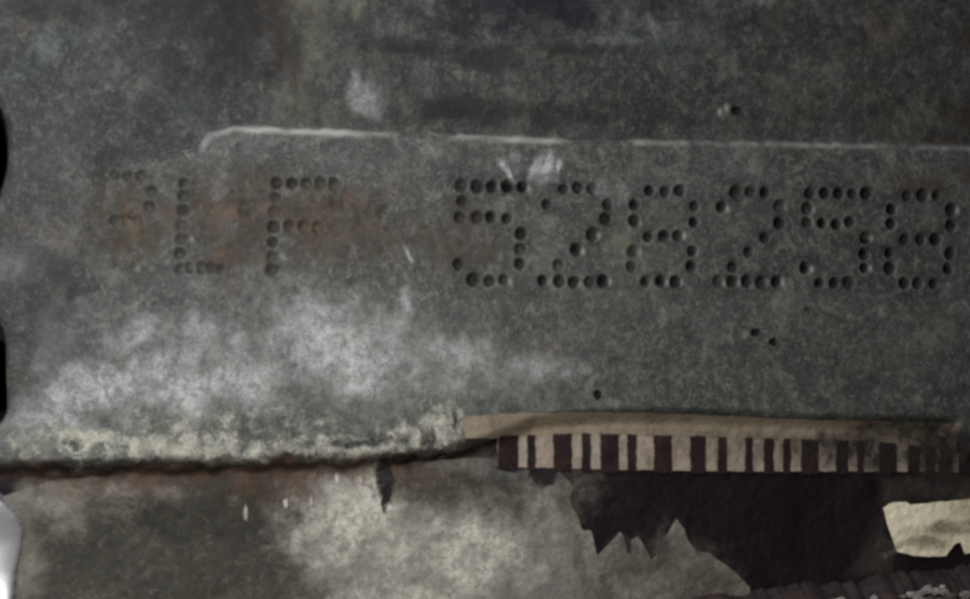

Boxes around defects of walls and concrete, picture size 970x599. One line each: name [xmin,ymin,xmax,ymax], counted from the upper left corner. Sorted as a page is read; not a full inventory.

water stain [19,293,492,449]